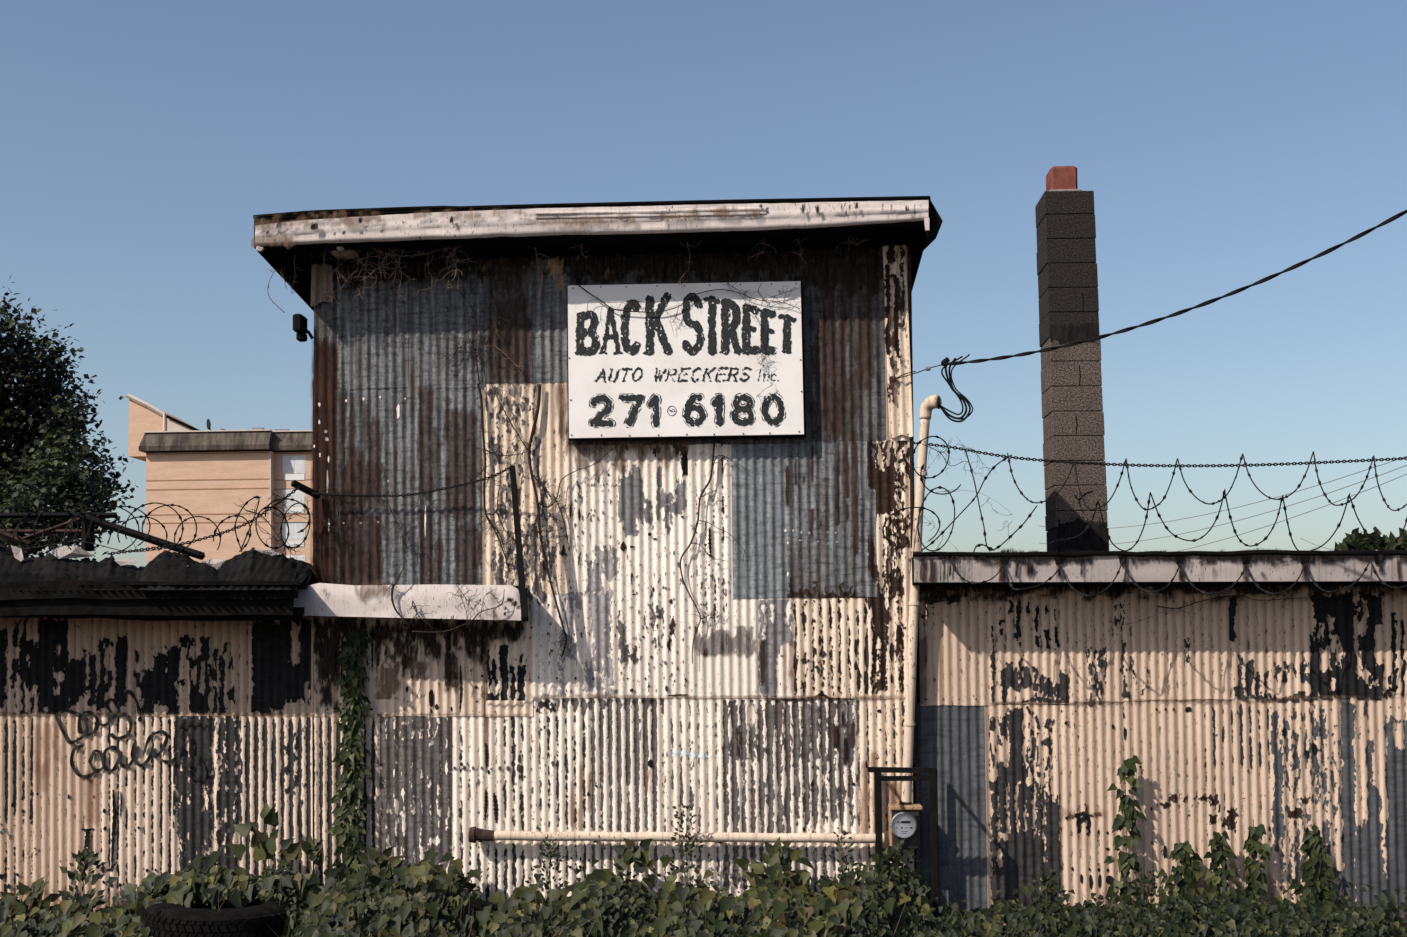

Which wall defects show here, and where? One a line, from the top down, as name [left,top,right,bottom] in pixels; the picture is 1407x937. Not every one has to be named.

rust [488,258,532,383]
rust [311,339,386,585]
rust [417,386,481,585]
rust [785,274,935,700]
peeling [893,440,910,560]
rust [980,556,1034,582]
rust [1379,554,1401,580]
peeling [0,618,345,907]
peeling [943,599,1148,909]
peeling [1151,589,1407,924]